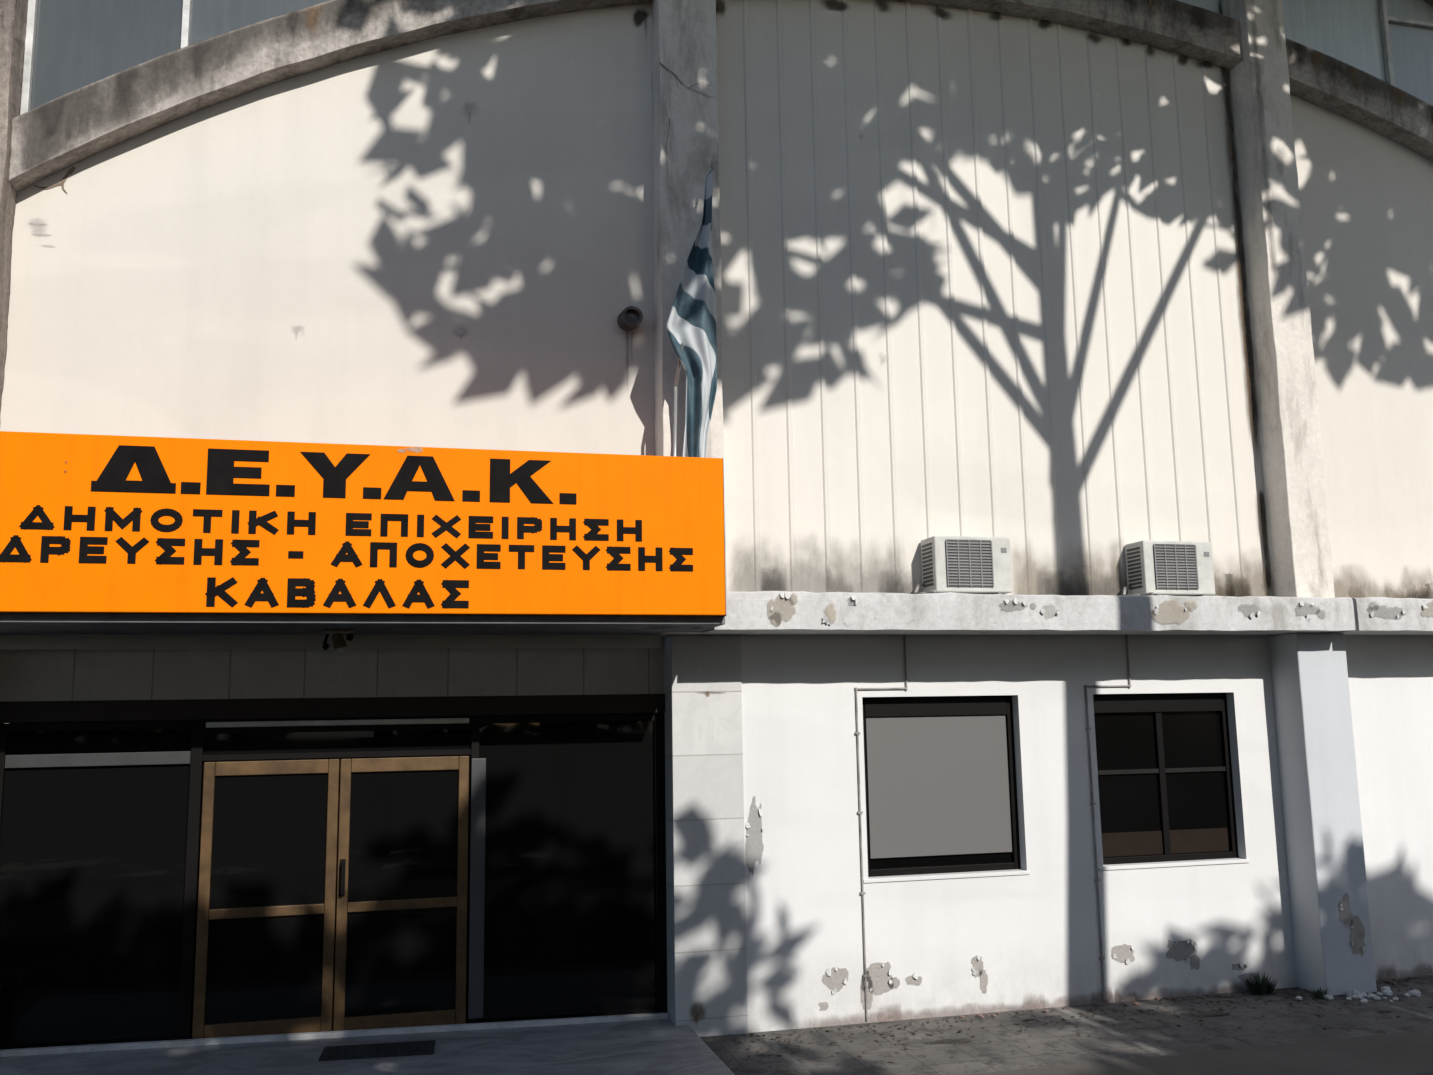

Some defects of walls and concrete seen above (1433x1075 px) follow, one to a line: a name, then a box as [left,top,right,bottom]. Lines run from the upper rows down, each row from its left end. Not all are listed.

peeling [768,592,798,625]
peeling [1152,599,1198,624]
peeling [745,796,764,874]
peeling [1338,893,1366,956]
peeling [1111,944,1135,965]
peeling [1166,939,1200,970]
peeling [819,962,922,1011]
peeling [971,955,988,993]